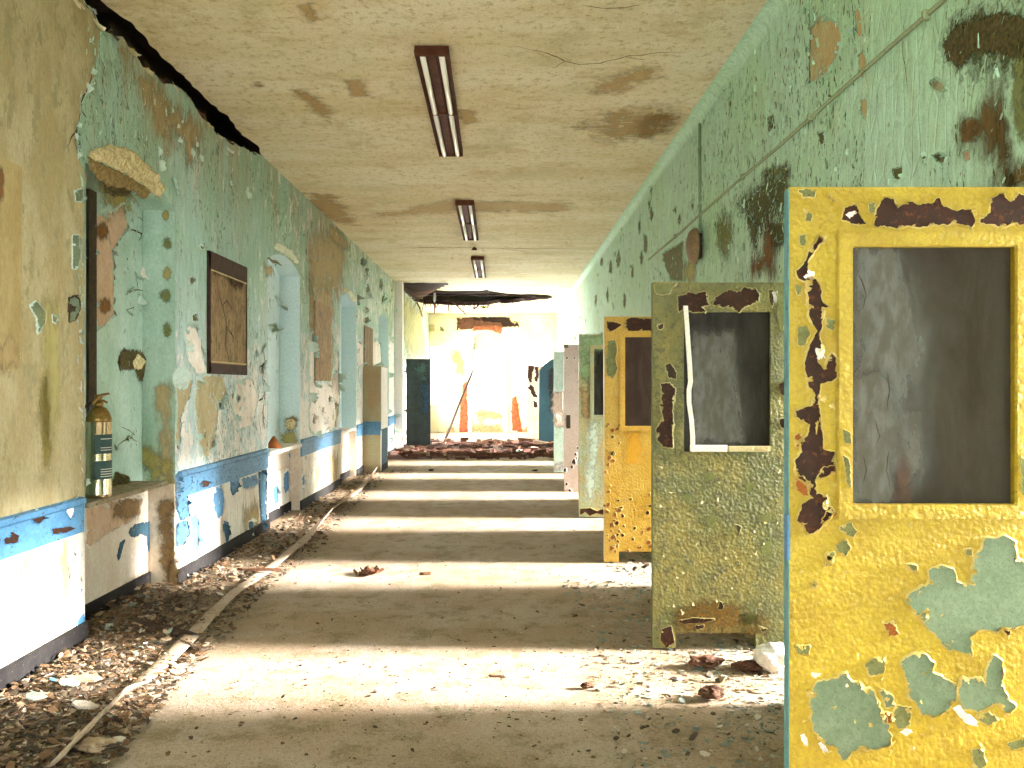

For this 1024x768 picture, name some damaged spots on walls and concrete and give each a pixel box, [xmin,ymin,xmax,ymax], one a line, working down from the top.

crack [517,46,670,67]
damp [583,108,679,139]
damp [942,0,1024,142]
peeling [0,0,401,549]
damp [308,193,355,329]
peeling [574,0,876,380]
damp [715,164,790,260]
rust [579,423,651,553]
peeling [824,520,858,566]
peeling [904,533,1024,658]
peeling [800,650,1018,762]
peeling [970,742,988,768]